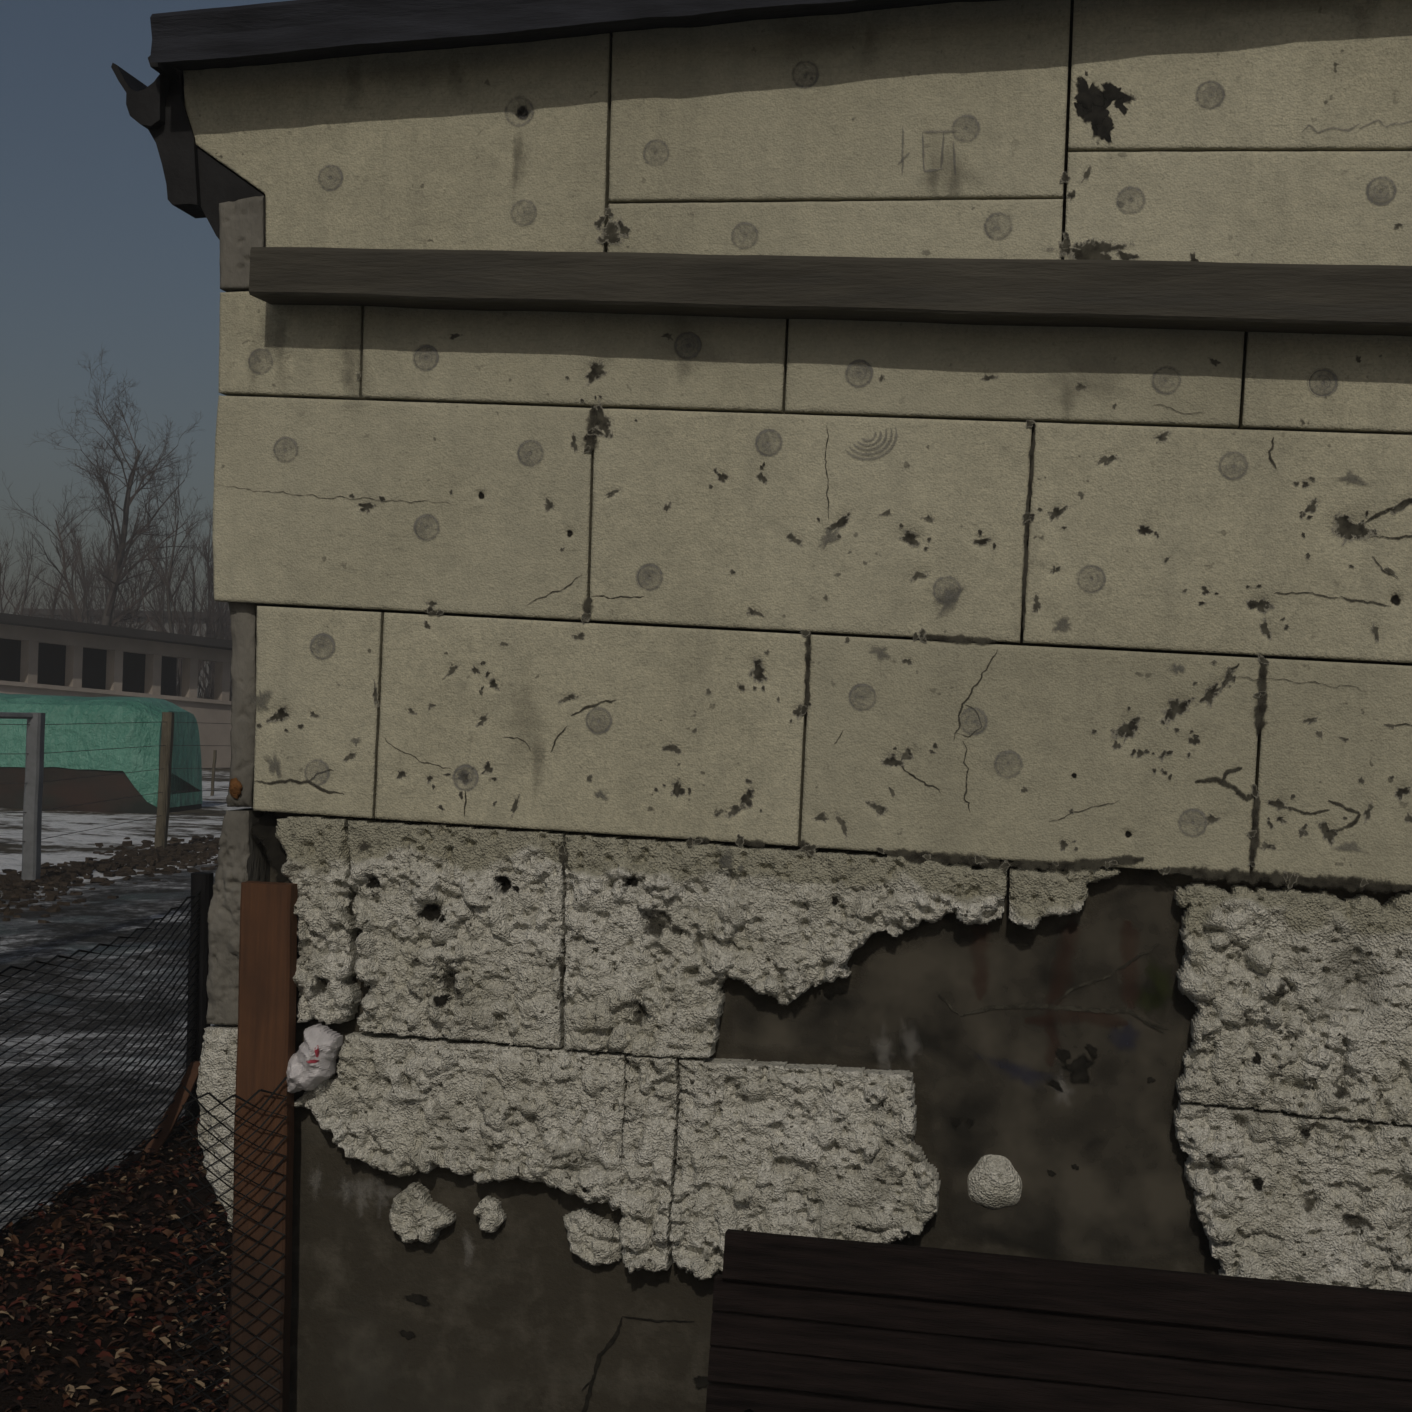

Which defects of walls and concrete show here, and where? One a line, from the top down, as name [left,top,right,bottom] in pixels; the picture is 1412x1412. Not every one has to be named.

spalling [714,778,762,818]
peeling [814,811,848,837]
spalling [1053,840,1078,866]
spalling [729,866,1204,1264]